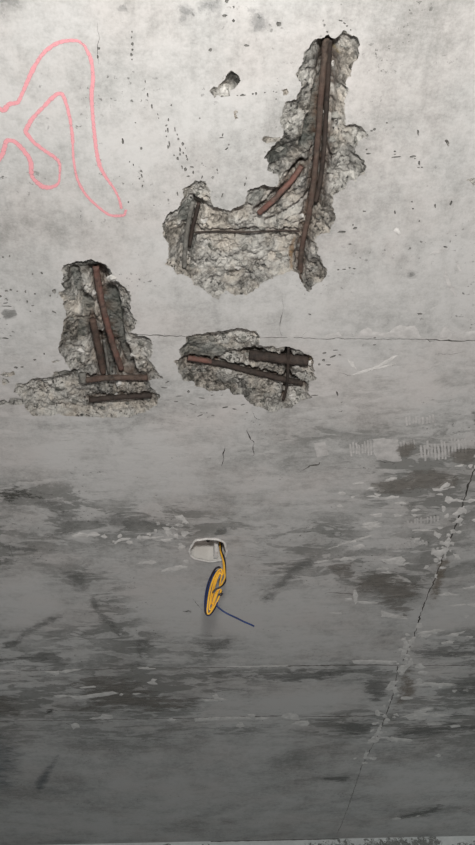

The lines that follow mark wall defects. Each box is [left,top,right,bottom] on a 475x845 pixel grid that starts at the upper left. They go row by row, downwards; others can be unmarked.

spalling [147,20,376,300]
spalling [0,259,169,418]
crack [257,301,390,340]
crack [410,339,475,355]
spalling [174,328,341,412]
water stain [398,444,415,457]
water stain [449,448,475,464]
water stain [0,486,41,502]
water stain [373,471,457,494]
water stain [328,563,417,616]
crack [211,469,475,842]
water stain [70,676,194,712]